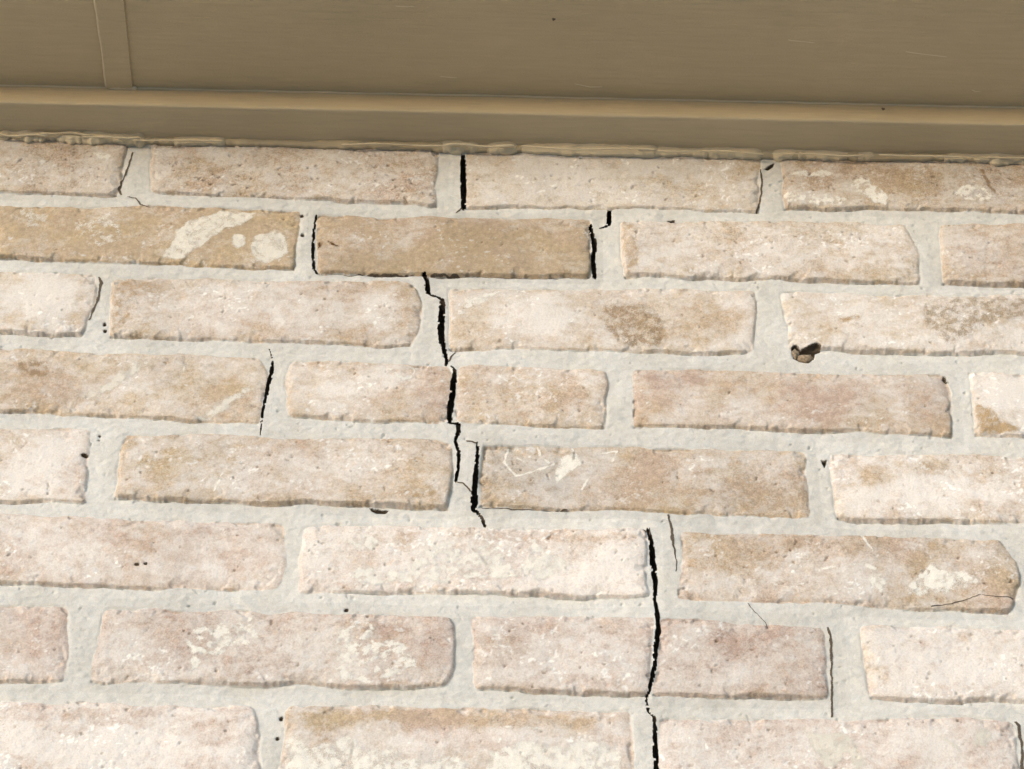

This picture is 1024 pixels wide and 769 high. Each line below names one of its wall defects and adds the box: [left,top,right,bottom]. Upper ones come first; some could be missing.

crack [456,160,467,213]
crack [590,213,612,279]
crack [260,351,274,435]
crack [344,273,568,528]
crack [644,514,677,769]